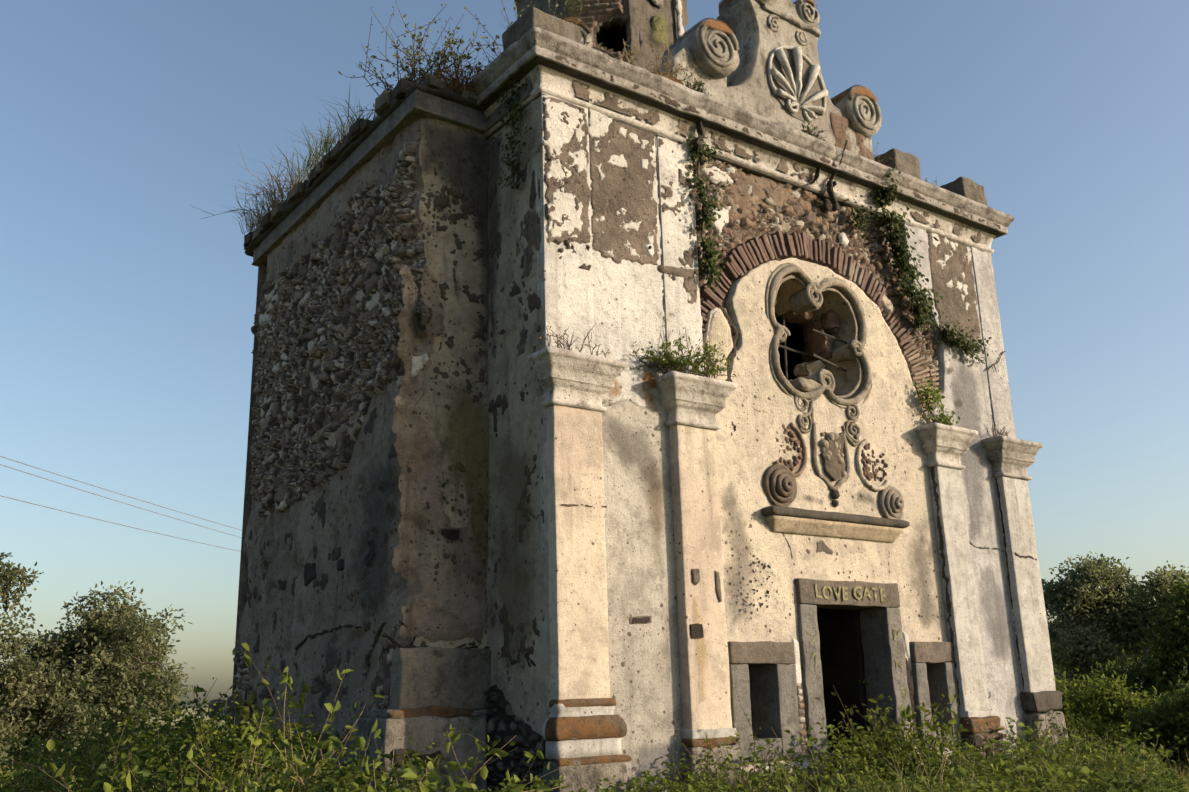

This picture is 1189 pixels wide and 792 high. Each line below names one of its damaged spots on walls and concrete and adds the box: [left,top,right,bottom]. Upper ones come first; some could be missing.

spalling [500,55,1001,400]
spalling [247,141,544,718]
spalling [232,634,275,721]
crack [295,620,536,676]
spalling [629,615,652,624]
spalling [691,569,700,585]
spalling [690,623,704,639]
spalling [715,554,773,614]
spalling [806,540,833,555]
crack [930,467,1037,705]
damp [986,576,1007,652]